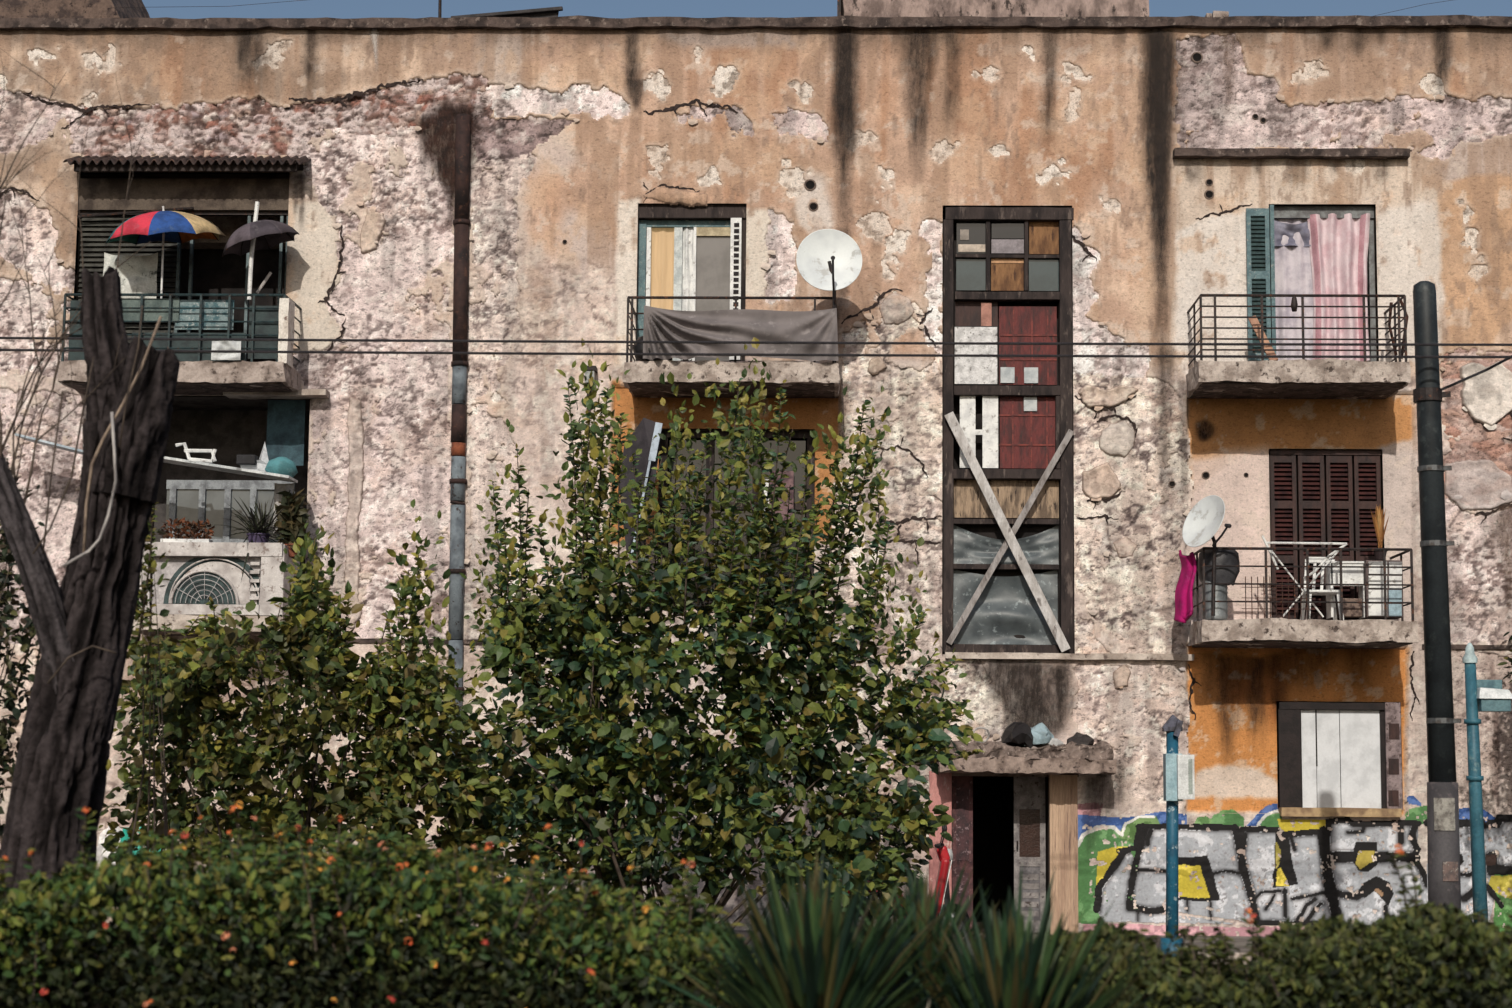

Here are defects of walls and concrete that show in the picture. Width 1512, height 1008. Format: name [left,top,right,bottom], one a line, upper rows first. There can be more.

crack [318,225,346,351]
crack [643,99,738,117]
flaking render [643,46,754,137]
flaking render [761,159,818,305]
water stain [835,29,854,195]
water stain [908,30,928,146]
water stain [1046,35,1054,117]
water stain [1143,29,1173,299]
flaking render [1173,33,1512,175]
flaking render [0,73,630,650]
flaking render [1439,348,1512,849]
water stain [973,659,1069,732]